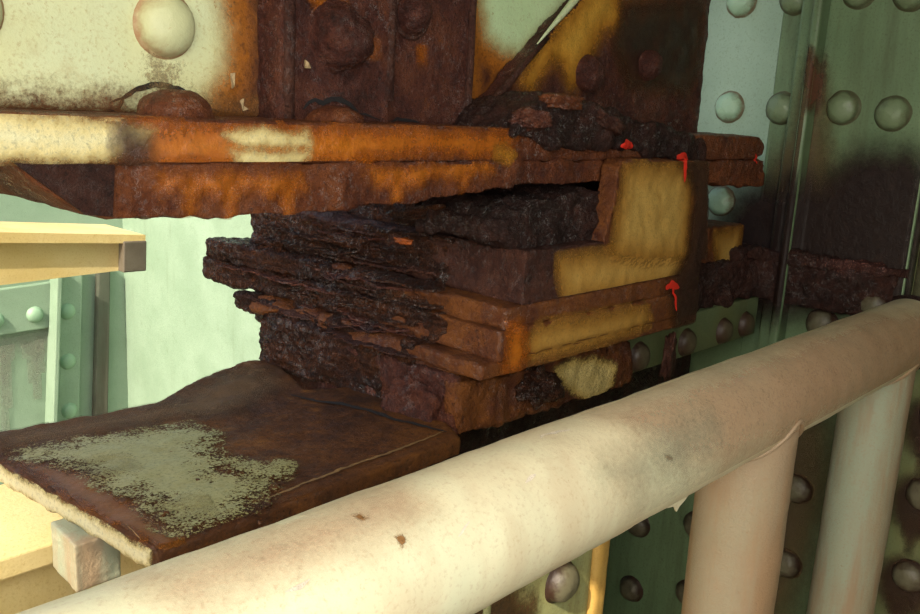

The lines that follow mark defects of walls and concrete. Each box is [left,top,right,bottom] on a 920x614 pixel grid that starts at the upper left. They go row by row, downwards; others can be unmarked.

corrosion [803,46,827,113]
corrosion [0,0,516,449]
peeling [557,161,692,297]
corrosion [659,147,920,382]
peeling [525,306,650,399]
corrosion [19,460,192,560]